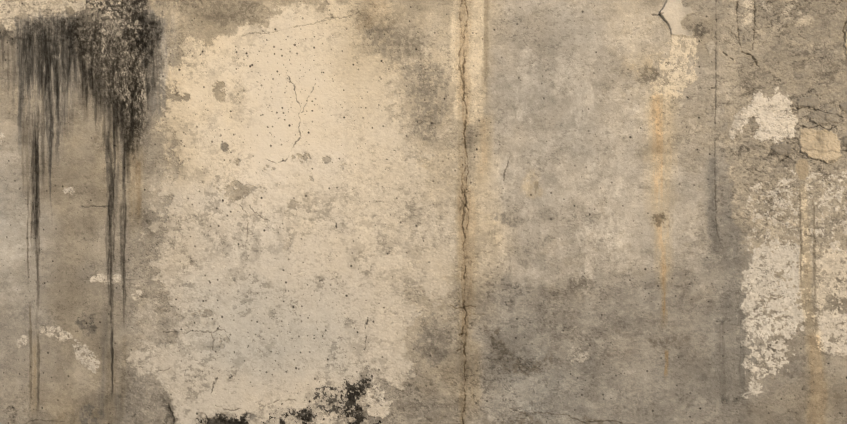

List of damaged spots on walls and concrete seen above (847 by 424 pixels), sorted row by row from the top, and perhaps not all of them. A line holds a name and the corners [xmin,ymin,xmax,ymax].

damp [0,0,186,424]
peeling [127,0,456,424]
damp [192,371,391,424]
crack [449,0,486,424]
crack [502,153,511,182]
crack [509,388,635,424]
spalling [659,0,847,396]